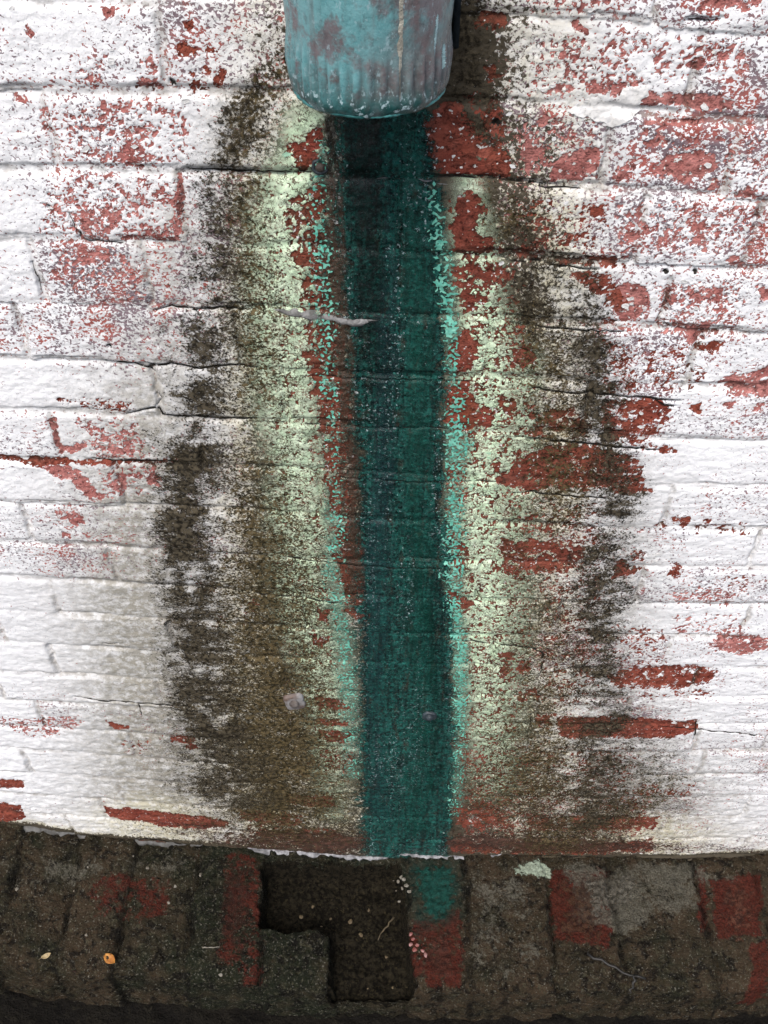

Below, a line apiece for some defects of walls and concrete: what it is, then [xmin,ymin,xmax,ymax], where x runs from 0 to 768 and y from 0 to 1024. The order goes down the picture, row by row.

peeling [100,6,115,19]
peeling [34,19,227,306]
crack [105,359,256,419]
crack [533,387,674,406]
peeling [0,397,181,539]
peeling [103,123,370,846]
leakage [126,38,768,921]
crack [516,436,658,450]
peeling [423,0,768,855]
peeling [0,716,85,737]
peeling [0,779,24,789]
peeling [0,802,26,822]